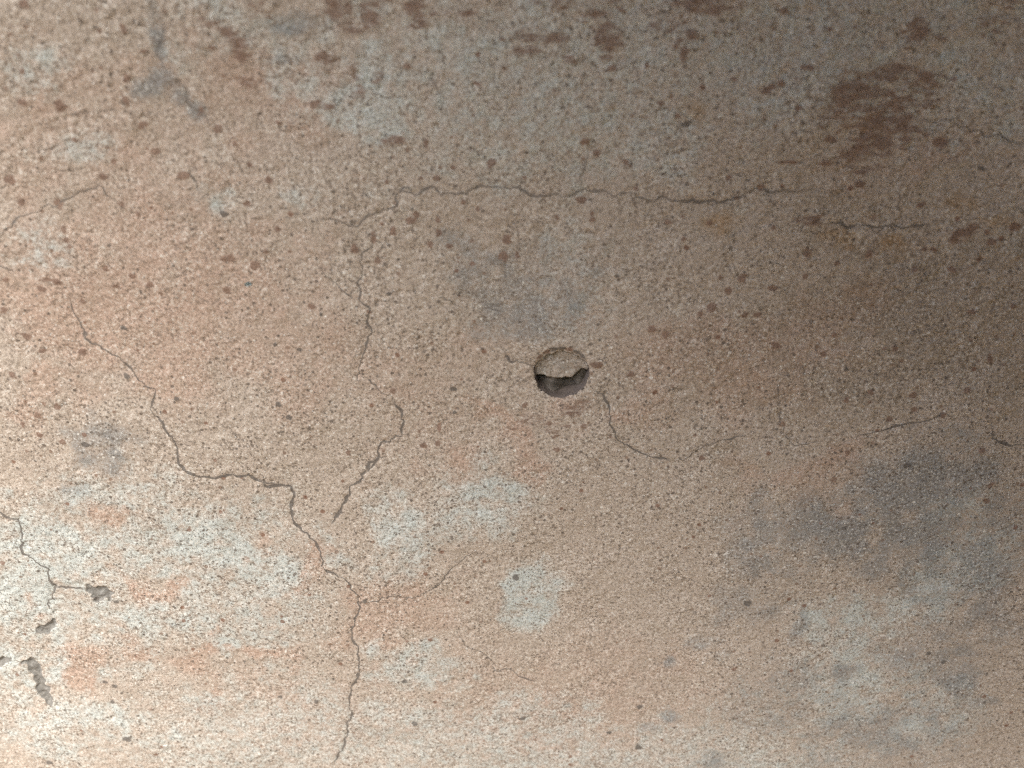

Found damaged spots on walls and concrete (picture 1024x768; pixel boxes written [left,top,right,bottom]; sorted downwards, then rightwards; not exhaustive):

crack [152,0,216,128]
crack [0,184,121,237]
crack [819,221,929,230]
spalling [535,345,587,361]
crack [57,145,811,764]
crack [0,511,85,609]
spalling [83,581,120,606]
spalling [33,610,60,637]
spalling [0,655,55,709]